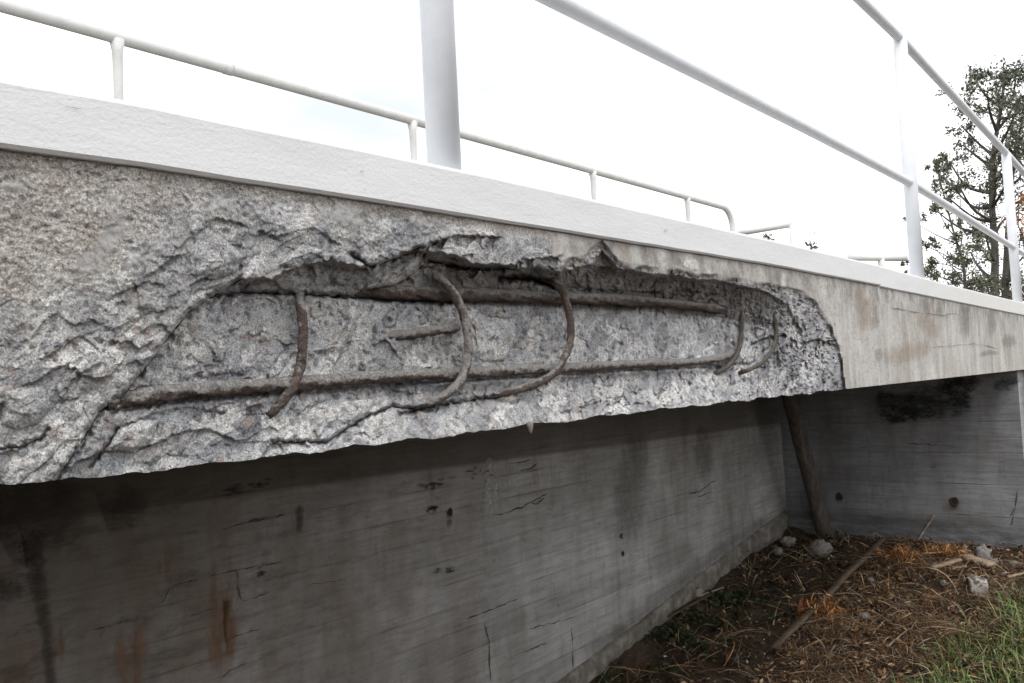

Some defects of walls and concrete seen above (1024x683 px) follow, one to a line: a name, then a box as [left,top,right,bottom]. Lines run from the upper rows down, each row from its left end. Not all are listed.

crack [59,247,550,476]
spalling [0,219,846,485]
leakage [876,375,977,422]
crack [485,492,549,516]
crack [162,562,282,617]
crack [466,599,517,678]